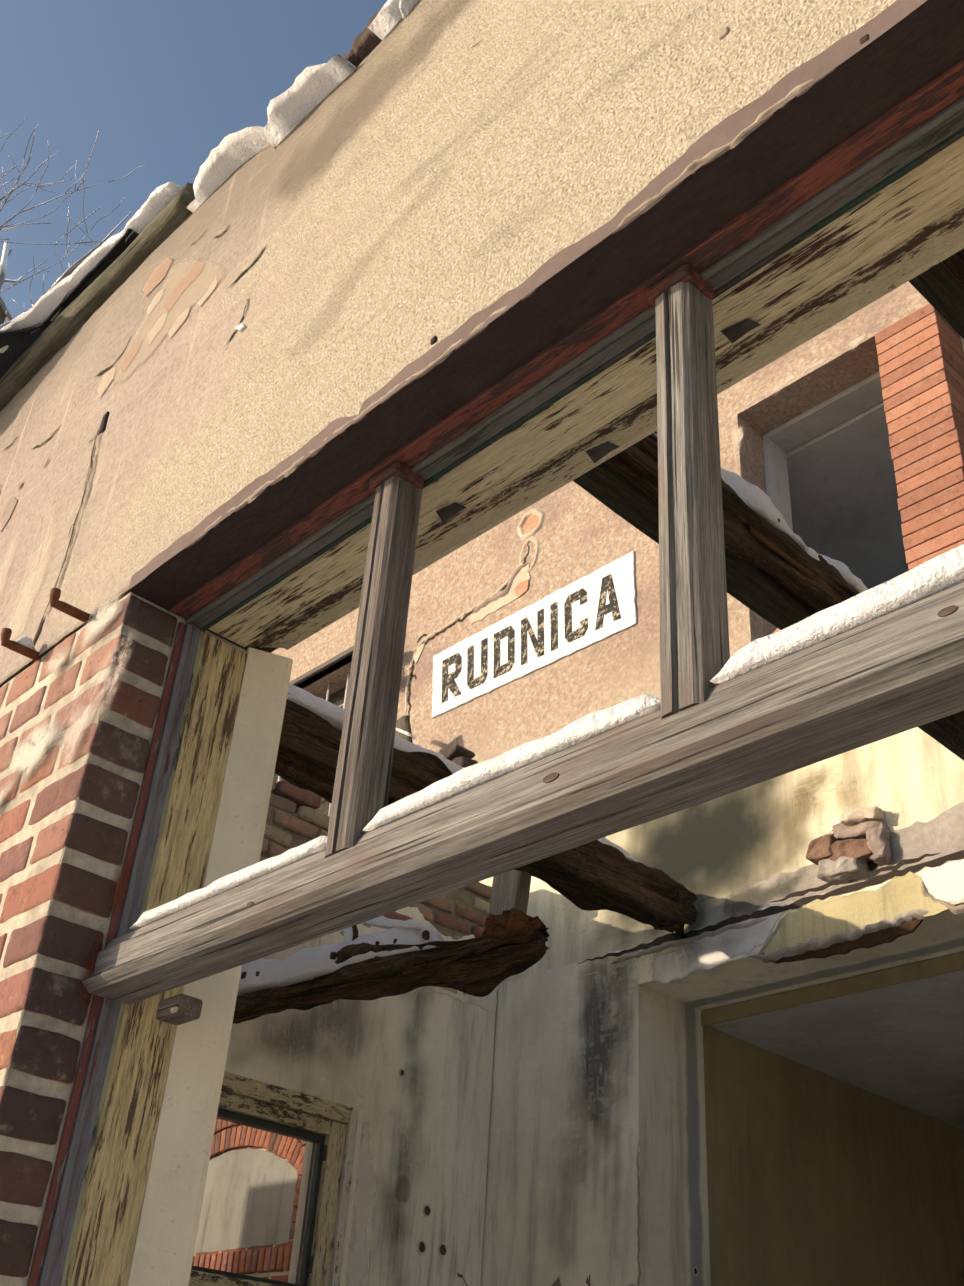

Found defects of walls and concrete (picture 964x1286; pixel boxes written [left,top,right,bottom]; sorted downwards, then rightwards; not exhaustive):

spalling [613,69,835,234]
peeling [0,497,18,532]
crack [0,423,63,492]
crack [33,411,110,644]
crack [95,334,133,377]
flaking render [97,257,223,397]
spalling [186,290,535,549]
crack [405,542,529,717]
crack [577,850,964,964]
flaking render [654,806,964,982]
damp [582,962,625,1122]